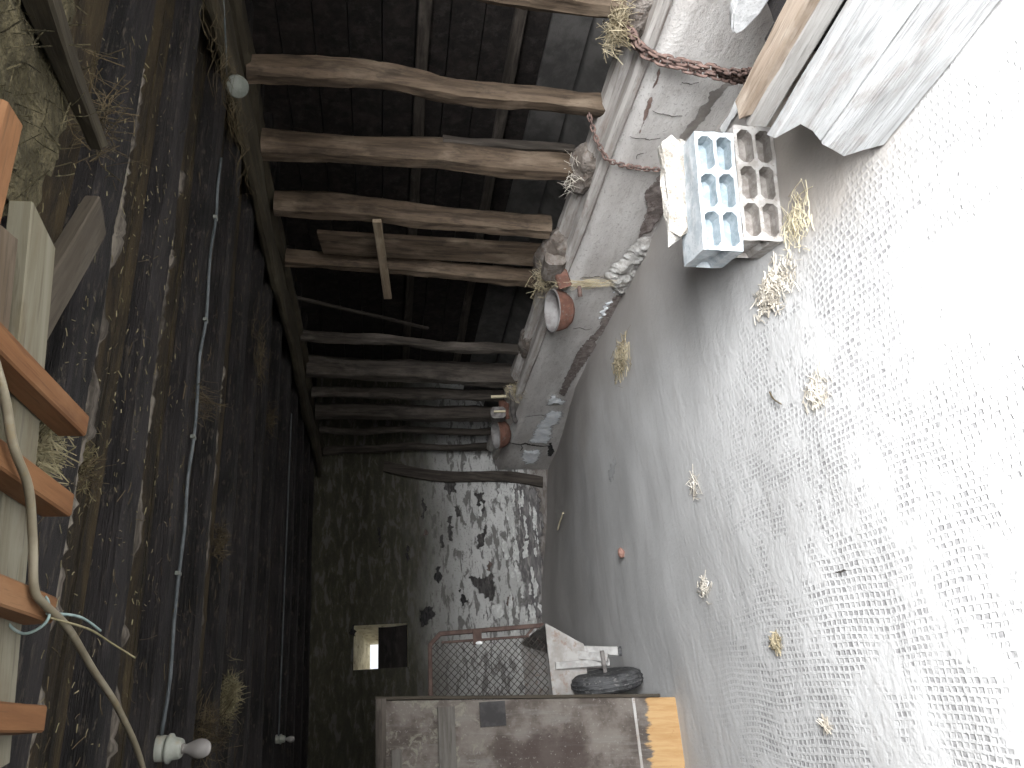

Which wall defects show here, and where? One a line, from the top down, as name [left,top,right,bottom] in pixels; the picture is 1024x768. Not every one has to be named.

spalling [559,295,622,396]
flaking render [440,482,461,548]
flaking render [420,606,435,627]
peeling [459,483,544,666]